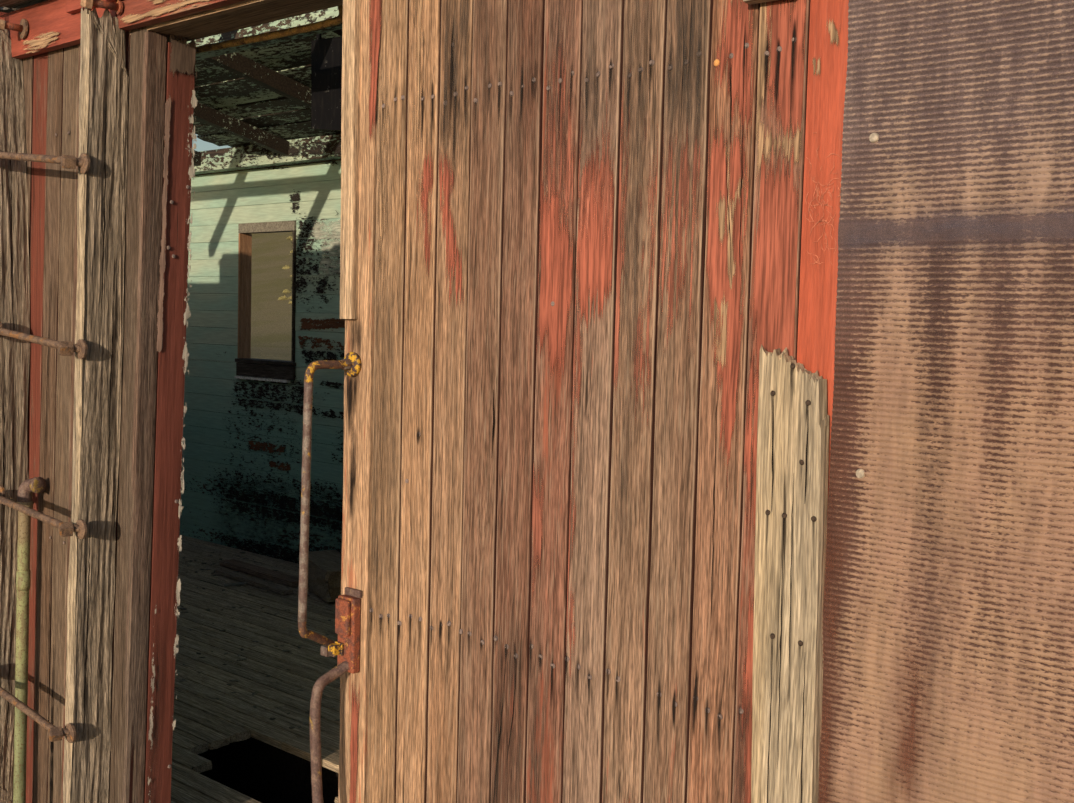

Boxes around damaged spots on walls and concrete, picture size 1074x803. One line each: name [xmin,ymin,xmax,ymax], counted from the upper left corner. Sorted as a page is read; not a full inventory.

peeling [23,31,59,54]
peeling [828,19,839,46]
peeling [239,137,341,169]
peeling [182,214,193,375]
peeling [289,189,341,305]
peeling [298,318,345,365]
peeling [417,146,464,305]
peeling [536,0,821,677]
peeling [178,406,187,519]
peeling [206,374,344,534]
peeling [218,535,332,564]
peeling [532,453,545,603]